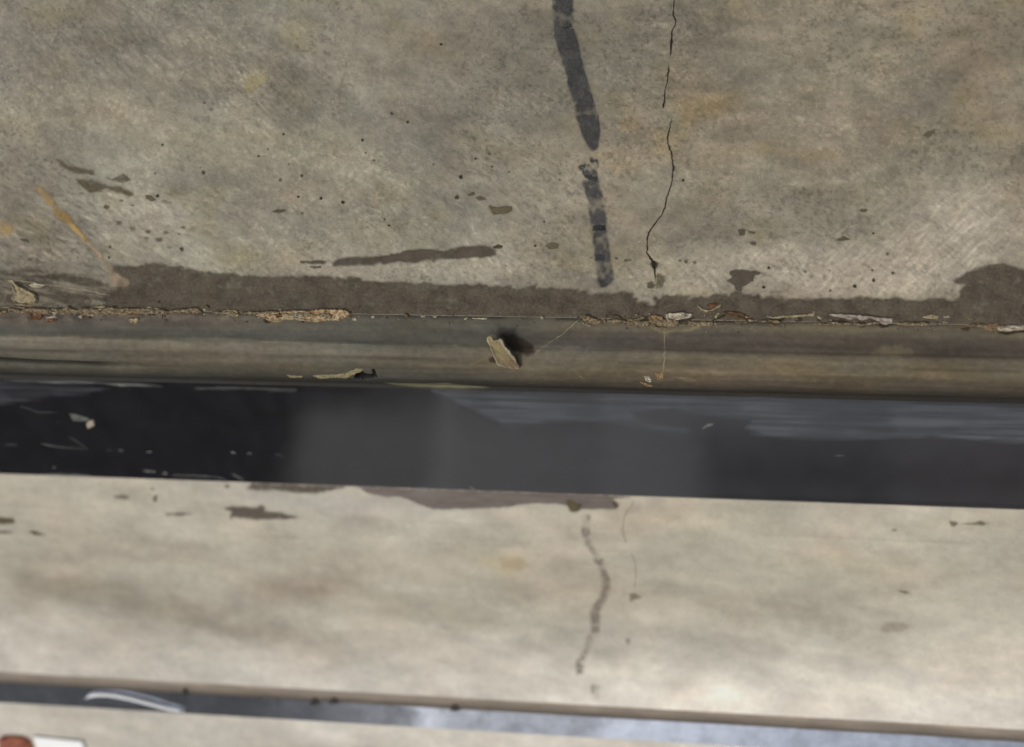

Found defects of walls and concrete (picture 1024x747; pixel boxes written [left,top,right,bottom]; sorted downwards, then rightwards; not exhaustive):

crack [646,0,677,278]
peeling [0,278,357,324]
damp [0,263,1024,325]
peeling [583,302,949,334]
spalling [962,317,1024,335]
spalling [487,335,533,369]